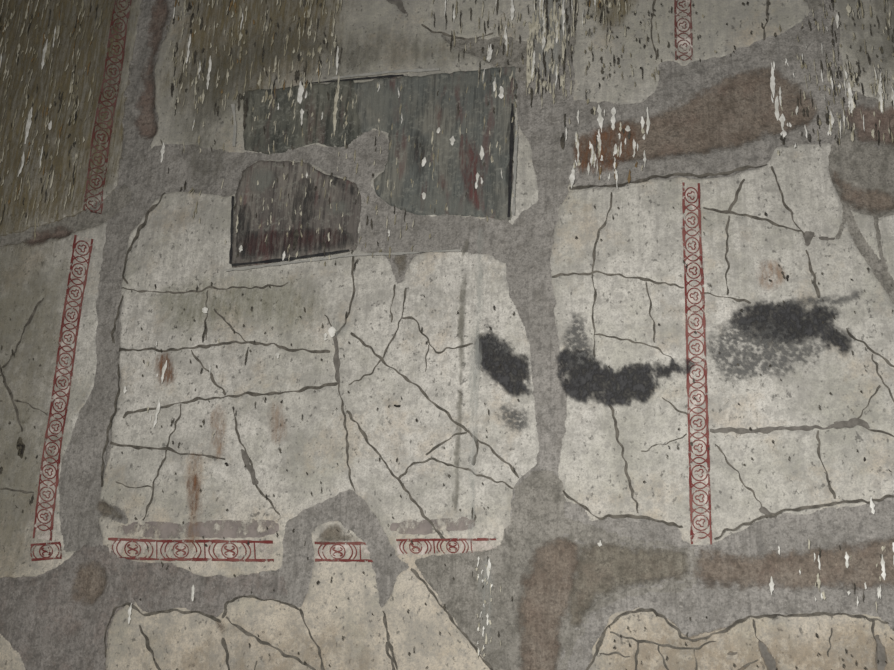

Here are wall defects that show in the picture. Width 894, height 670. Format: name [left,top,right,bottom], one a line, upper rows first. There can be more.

damp [0,0,123,240]
damp [166,0,377,266]
damp [351,84,414,271]
damp [408,98,467,188]
crack [552,164,820,359]
crack [104,595,325,670]
crack [101,192,519,542]
flaking render [320,526,349,542]
crack [563,397,687,528]
flaking render [570,539,894,625]
crack [586,608,894,670]
crack [710,328,894,540]